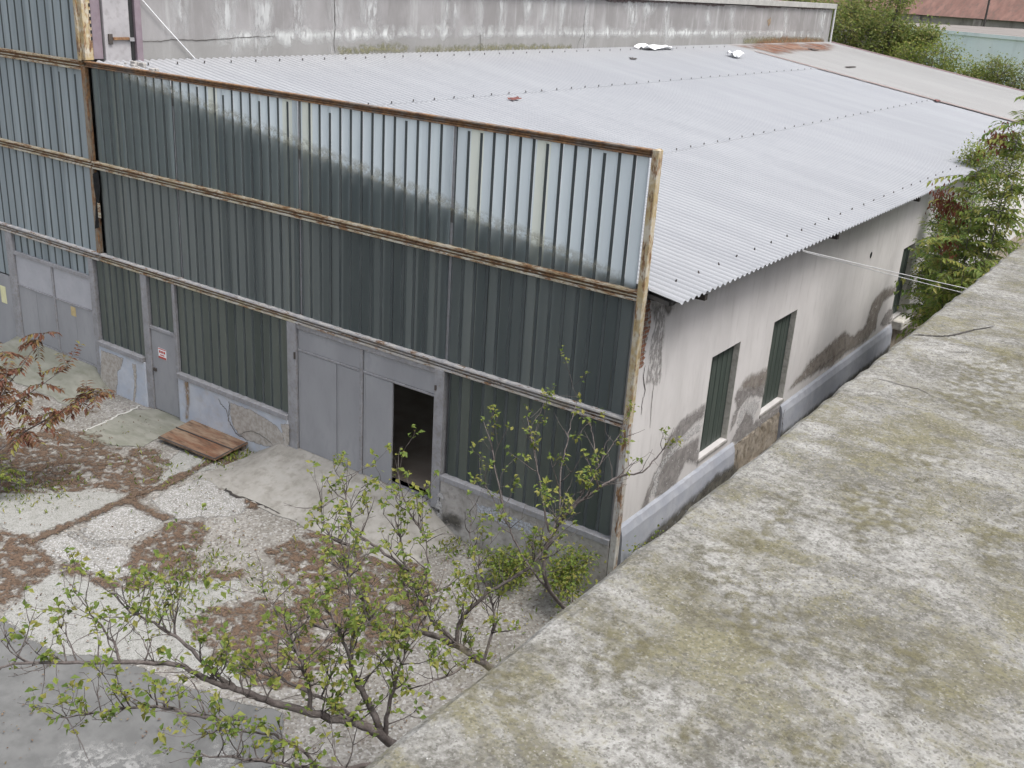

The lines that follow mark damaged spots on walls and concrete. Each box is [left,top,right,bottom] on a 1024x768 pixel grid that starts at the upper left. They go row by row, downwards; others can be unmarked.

corrosion [744,37,1019,123]
flaking render [639,300,664,384]
water stain [793,287,895,386]
crack [219,400,272,444]
water stain [642,406,705,508]
water stain [731,370,780,442]
spalling [733,412,780,469]